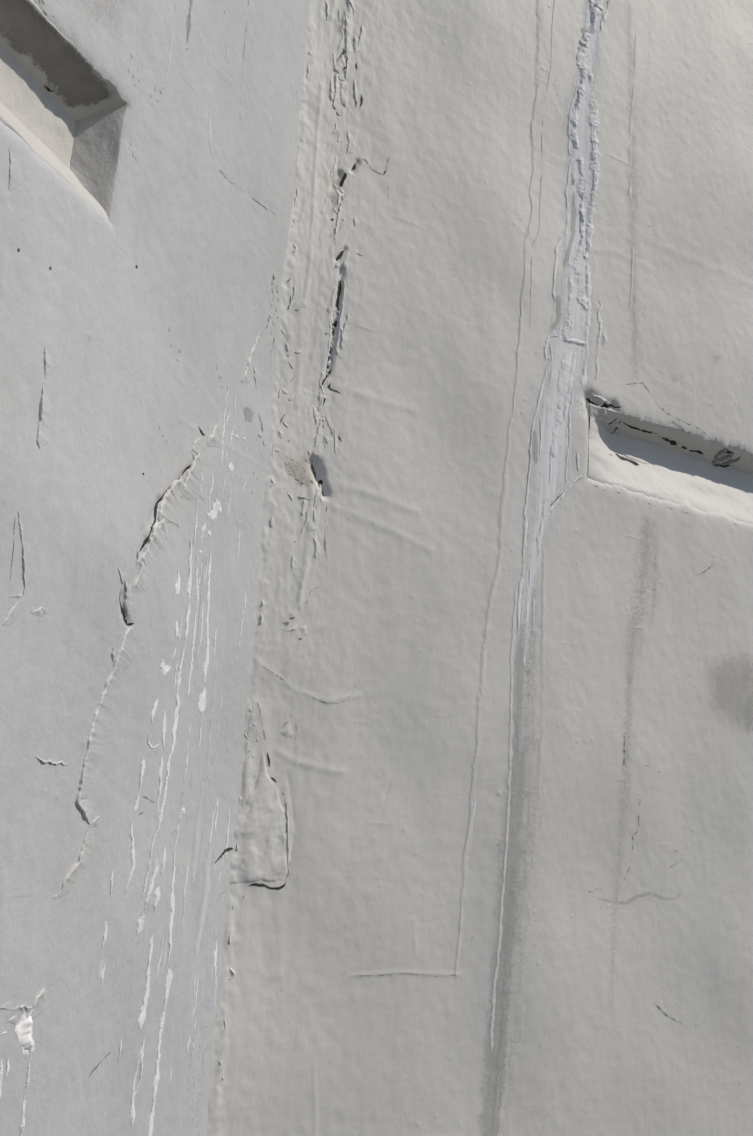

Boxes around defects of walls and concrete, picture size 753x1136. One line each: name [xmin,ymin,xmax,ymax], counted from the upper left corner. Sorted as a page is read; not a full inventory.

peeling [321,0,366,236]
peeling [325,252,351,359]
peeling [243,372,342,570]
crack [545,382,708,516]
peeling [10,510,27,598]